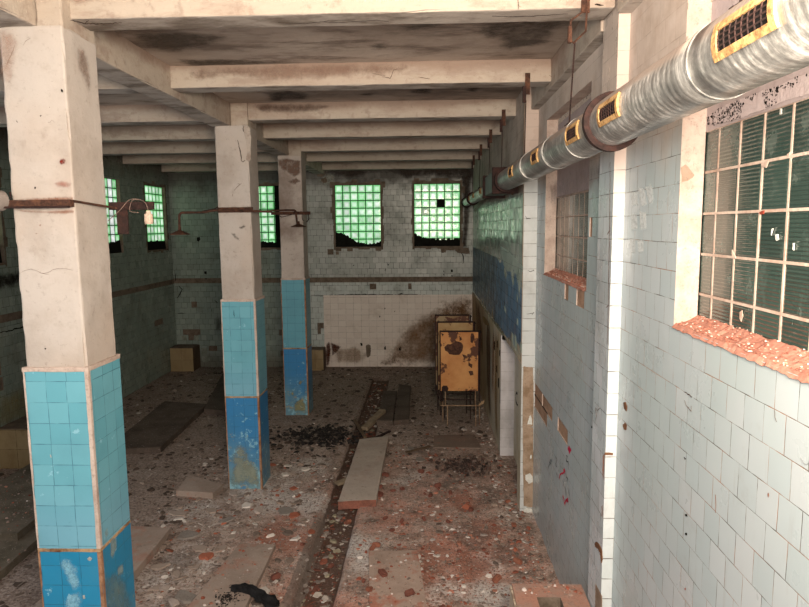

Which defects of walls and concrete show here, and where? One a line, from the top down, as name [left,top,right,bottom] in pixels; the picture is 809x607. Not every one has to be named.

damp [141,33,218,50]
damp [486,22,561,48]
peeling [279,159,300,183]
peeling [535,383,568,444]